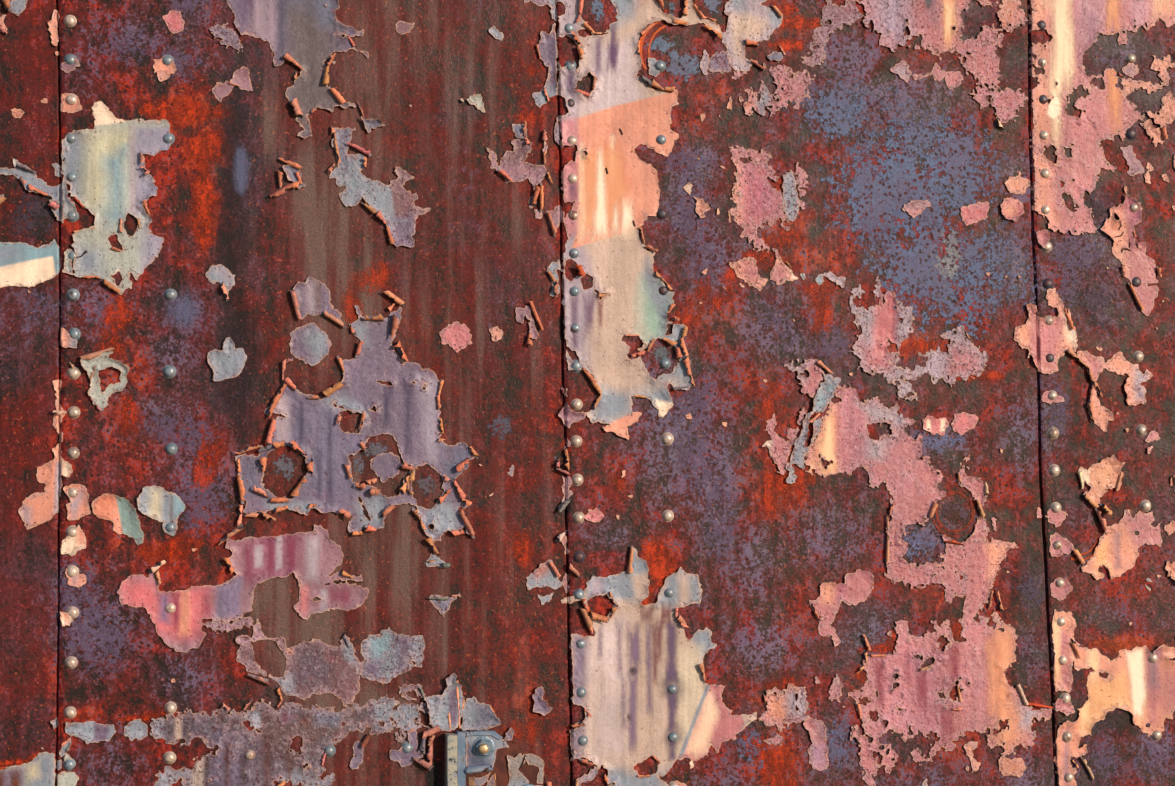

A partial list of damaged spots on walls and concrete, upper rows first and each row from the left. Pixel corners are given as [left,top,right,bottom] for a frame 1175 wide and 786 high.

peeling [48,10,80,73]
peeling [0,93,171,295]
rust [100,294,132,359]
rust [142,96,233,248]
peeling [209,0,431,248]
peeling [487,0,1175,513]
peeling [0,277,545,786]
rust [273,454,298,480]
rust [641,536,676,605]
rust [763,467,815,513]
peeling [526,145,1175,786]
rust [859,630,896,654]